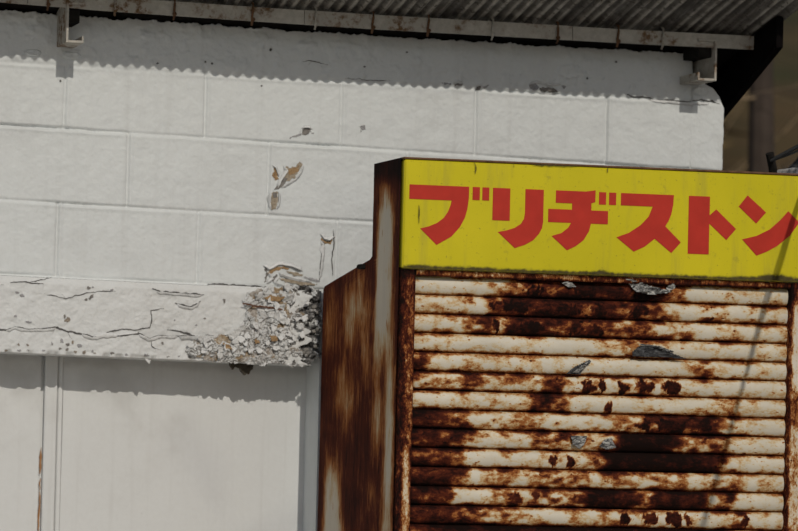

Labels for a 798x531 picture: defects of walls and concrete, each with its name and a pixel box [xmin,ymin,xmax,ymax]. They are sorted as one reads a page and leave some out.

peeling [267,162,304,210]
crack [10,277,113,299]
crack [0,283,266,349]
spalling [167,261,322,375]